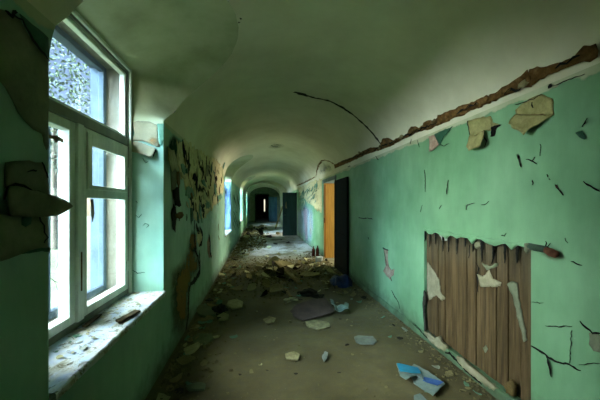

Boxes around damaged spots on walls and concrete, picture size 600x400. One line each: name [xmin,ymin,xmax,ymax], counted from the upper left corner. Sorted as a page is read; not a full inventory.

peeling [0,9,50,150]
crack [293,92,381,160]
spalling [334,44,599,169]
crack [576,118,588,140]
peeling [0,160,73,261]
peeling [132,121,280,258]
spalling [388,323,518,396]
crack [531,321,600,377]